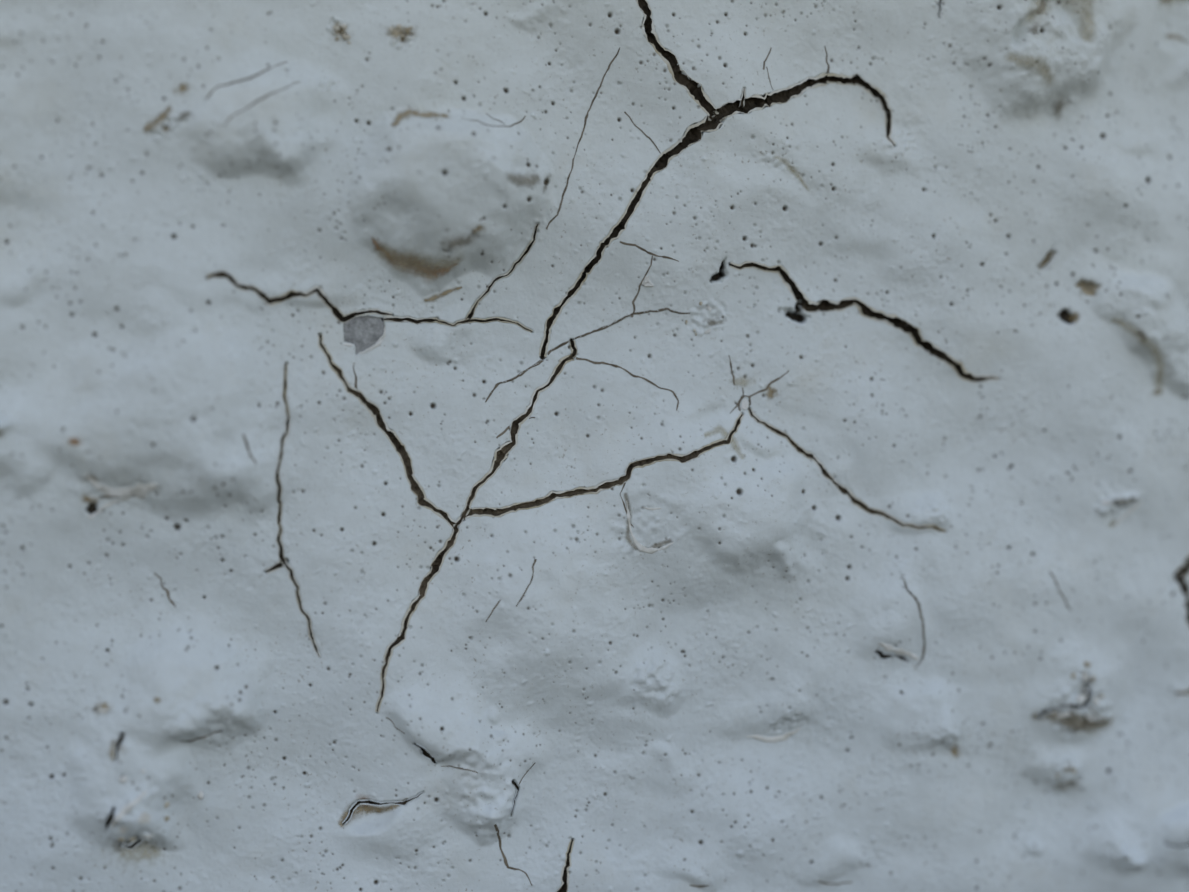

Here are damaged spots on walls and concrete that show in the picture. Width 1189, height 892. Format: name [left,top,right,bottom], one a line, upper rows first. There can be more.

spalling [342,316,386,354]
crack [729,261,999,383]
crack [205,0,946,773]
crack [1174,555,1189,626]
crack [1175,688,1189,696]
crack [342,791,424,825]
crack [494,763,575,892]